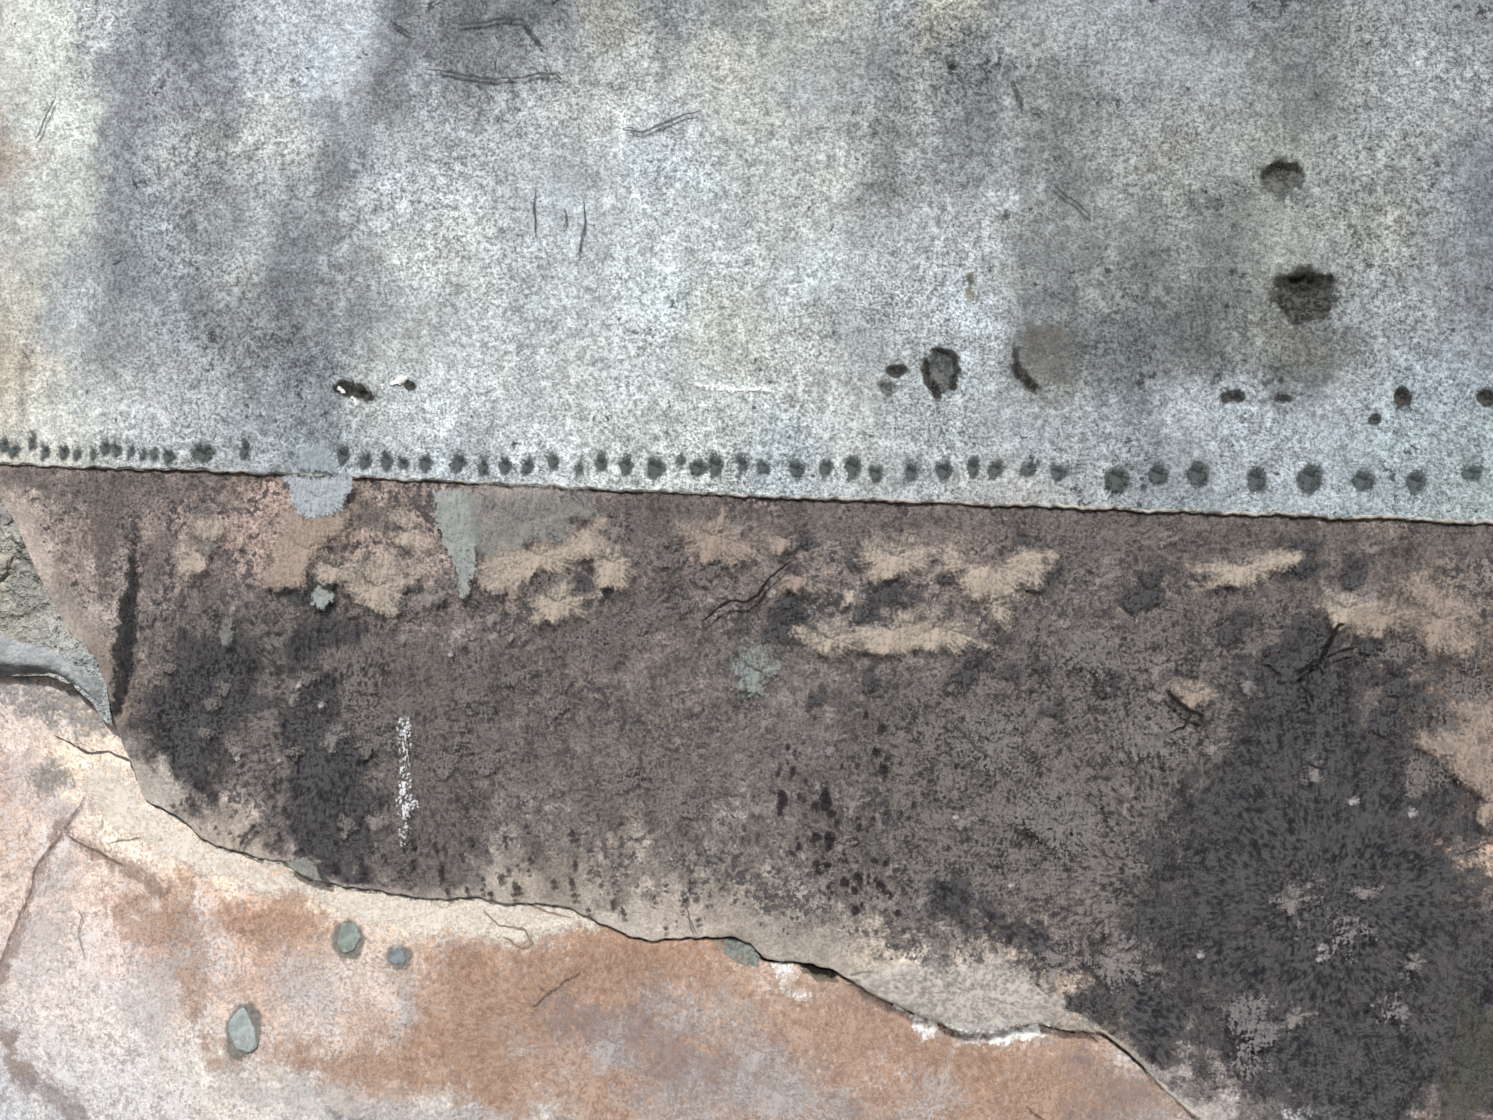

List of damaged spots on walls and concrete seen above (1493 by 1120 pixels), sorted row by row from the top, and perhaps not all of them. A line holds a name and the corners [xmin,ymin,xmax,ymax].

spalling [1258,156,1305,200]
spalling [878,344,961,399]
spalling [1394,385,1412,408]
flaking render [0,499,112,726]
leakage [761,528,815,644]
leakage [0,493,742,898]
rust [102,865,207,1020]
rust [212,893,337,949]
crack [0,736,700,963]
crack [755,950,799,964]
leakage [774,516,1493,1120]
crack [1005,971,1199,1120]